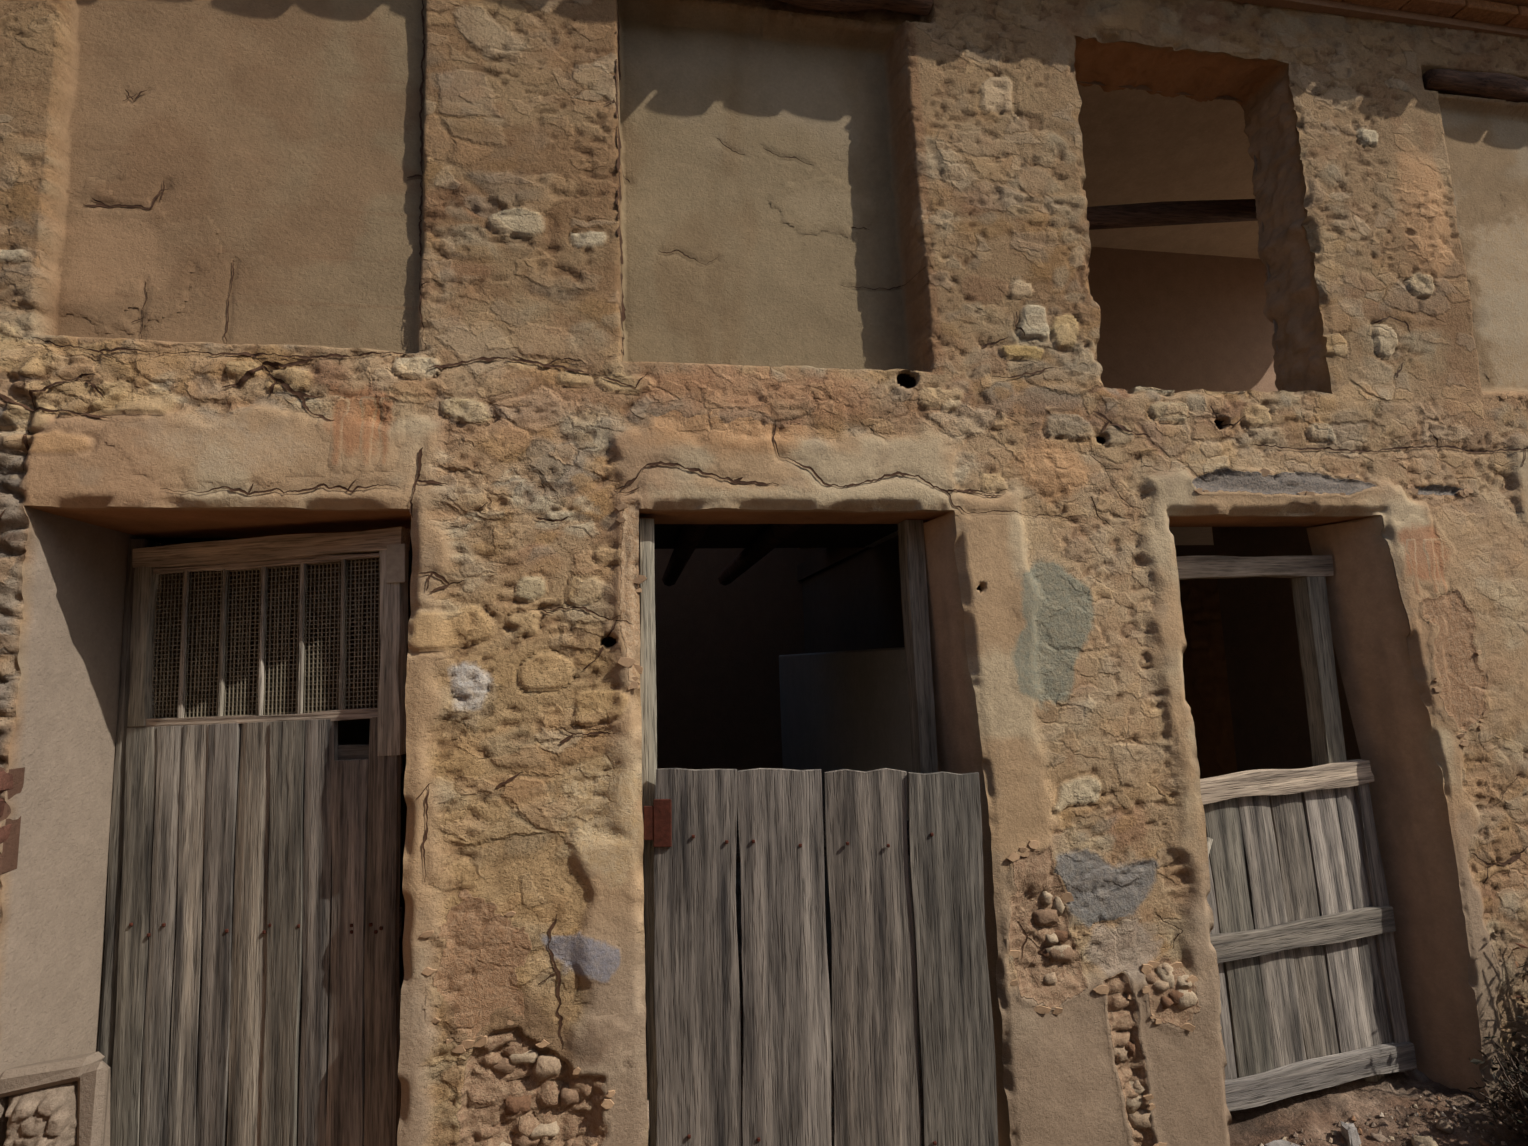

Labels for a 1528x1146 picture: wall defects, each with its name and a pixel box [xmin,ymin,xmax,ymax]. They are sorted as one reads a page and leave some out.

crack [0,0,647,470]
crack [614,411,1150,525]
spalling [420,871,615,1146]
crack [538,914,564,1045]
spalling [1000,837,1208,1146]